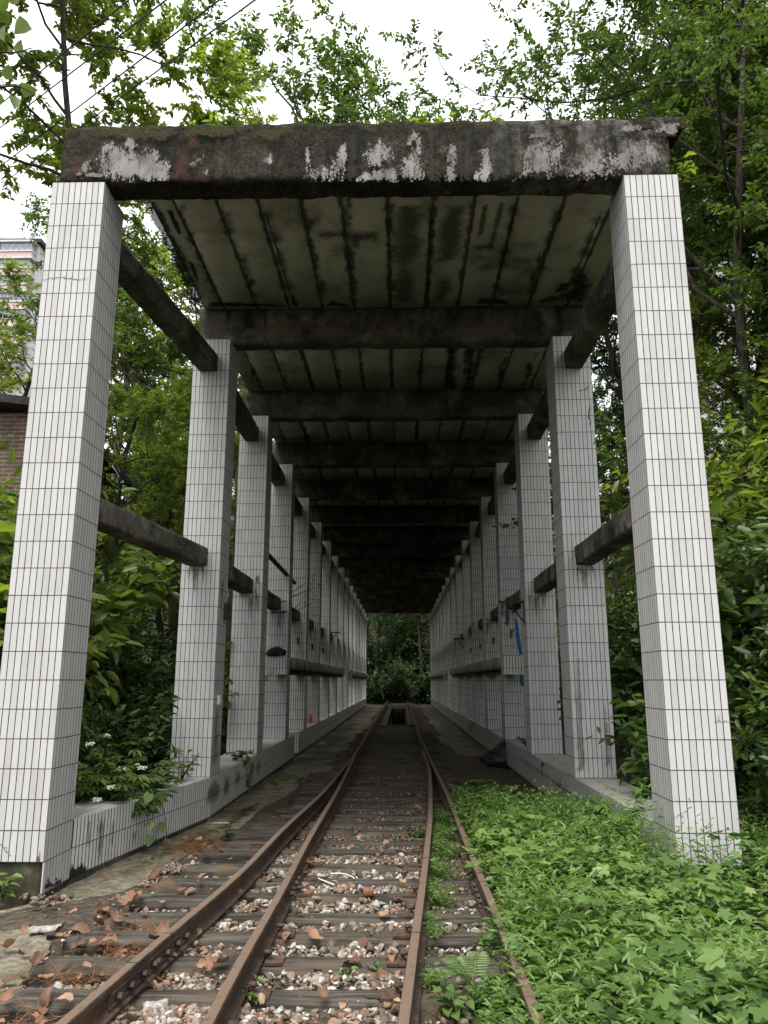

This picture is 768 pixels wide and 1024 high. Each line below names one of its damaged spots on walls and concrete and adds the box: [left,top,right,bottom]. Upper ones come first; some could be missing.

damp [142,201,299,336]
damp [306,220,377,283]
damp [386,205,463,301]
damp [208,763,260,799]
damp [44,863,87,889]